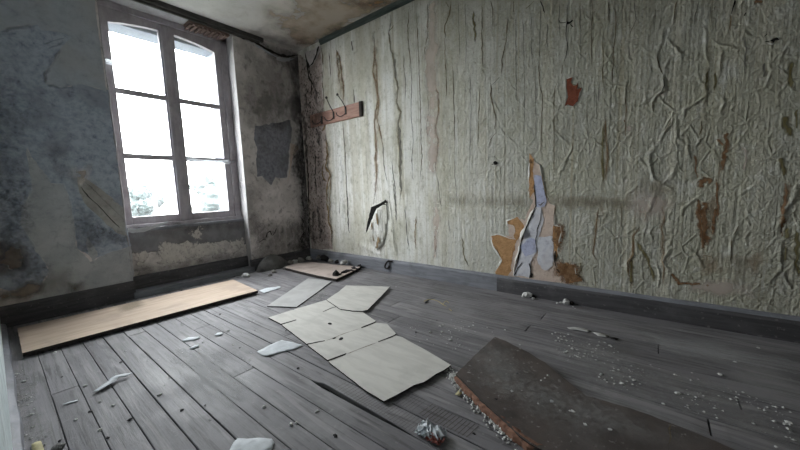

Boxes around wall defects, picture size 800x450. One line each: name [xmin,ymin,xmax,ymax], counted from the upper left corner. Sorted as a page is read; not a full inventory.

peeling [0,0,246,301]
peeling [241,38,333,250]
damp [291,58,340,249]
damp [271,0,391,44]
damp [373,5,454,248]
damp [444,2,493,65]
damp [490,1,548,124]
peeling [490,153,583,284]
peeling [564,76,582,107]
rust [694,156,720,257]
rust [717,133,730,170]